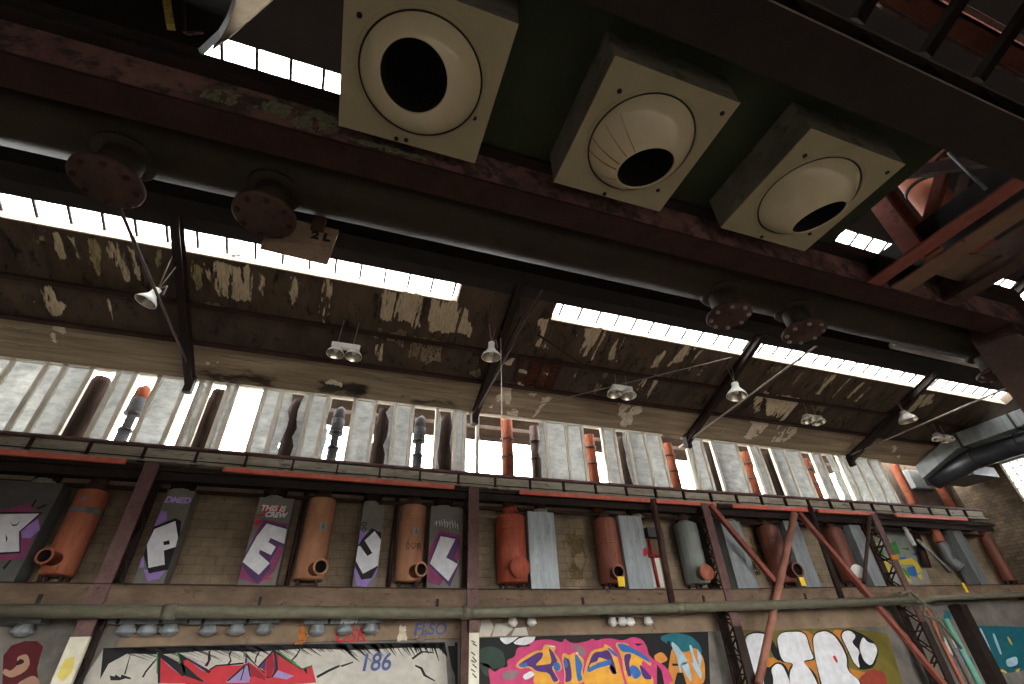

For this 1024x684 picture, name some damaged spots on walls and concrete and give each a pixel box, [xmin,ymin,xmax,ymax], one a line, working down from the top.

peeling [35,232,141,282]
peeling [191,251,265,309]
peeling [289,276,298,305]
peeling [370,289,472,365]
water stain [199,369,275,387]
water stain [317,379,368,396]
spalling [489,318,565,418]
peeling [576,328,625,394]
spalling [618,344,706,427]
peeling [743,373,804,443]
peeling [815,373,869,413]
peeling [907,394,935,413]